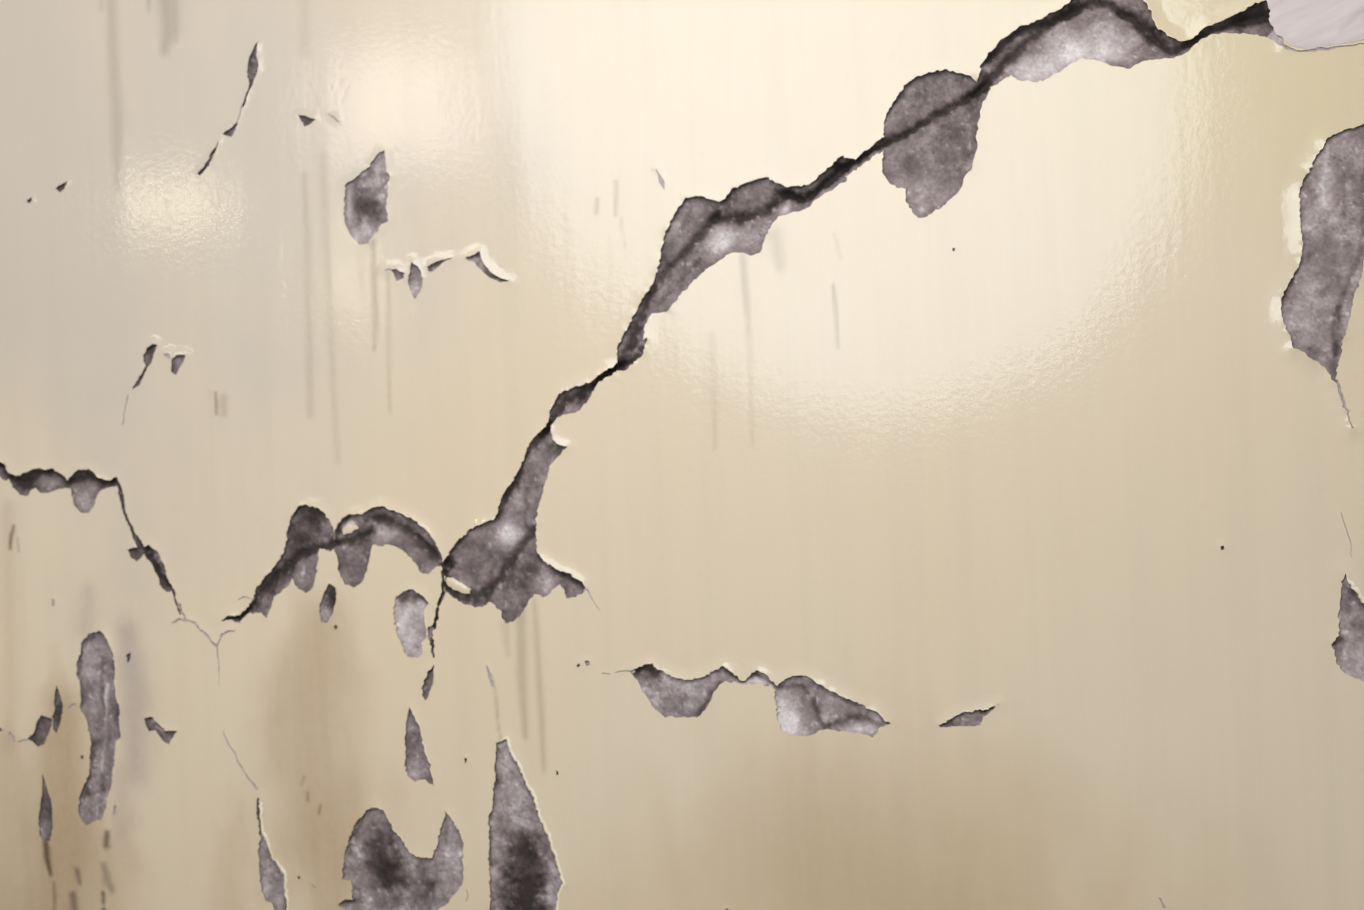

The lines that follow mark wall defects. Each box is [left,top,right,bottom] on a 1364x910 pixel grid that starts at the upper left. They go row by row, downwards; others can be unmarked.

peeling [190,36,265,180]
peeling [336,139,521,303]
crack [0,0,1364,707]
peeling [1251,112,1364,446]
peeling [0,620,186,846]
crack [217,725,262,790]
peeling [247,788,298,910]
peeling [387,579,436,664]
peeling [328,698,577,910]
peeling [618,650,904,746]
peeling [1311,549,1364,722]